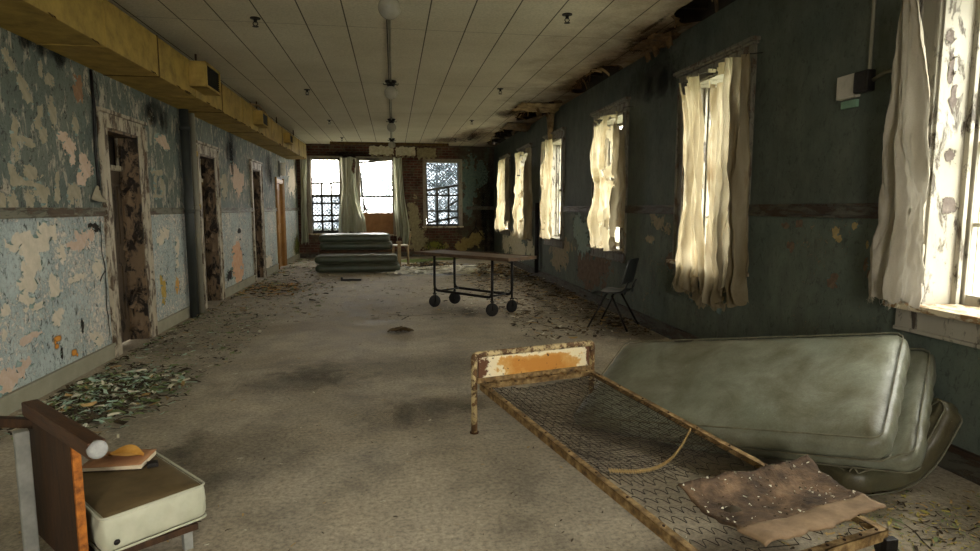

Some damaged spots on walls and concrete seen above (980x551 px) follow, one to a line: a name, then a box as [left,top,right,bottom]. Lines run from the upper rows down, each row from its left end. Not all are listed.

peeling [944,27,958,114]
peeling [0,47,108,342]
peeling [148,110,171,151]
peeling [220,140,244,201]
peeling [287,164,297,199]
damp [434,130,487,142]
flaking render [460,150,489,220]
peeling [945,148,956,162]
peeling [942,197,961,216]
peeling [156,226,181,306]
peeling [226,228,244,283]